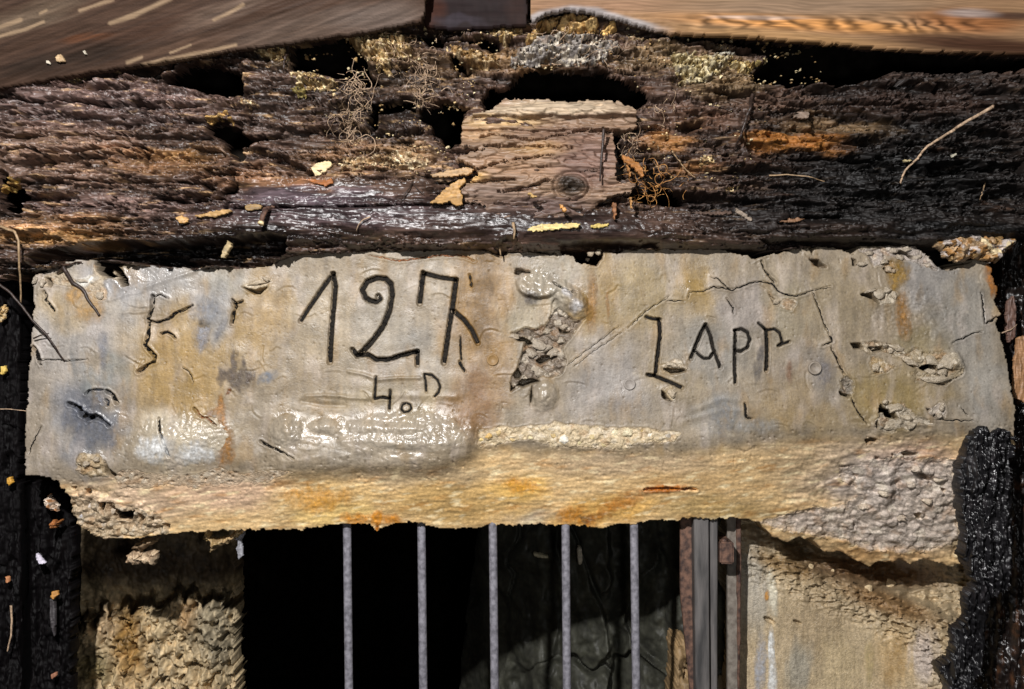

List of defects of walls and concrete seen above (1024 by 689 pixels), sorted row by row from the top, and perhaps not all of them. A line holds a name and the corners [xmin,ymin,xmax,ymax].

crack [572,262,844,373]
crack [953,292,995,343]
spalling [508,308,586,392]
spalling [862,341,964,384]
spalling [866,399,946,445]
spalling [68,493,170,539]
corrosion [560,499,634,527]
corrosion [648,485,680,493]
spalling [755,450,960,555]